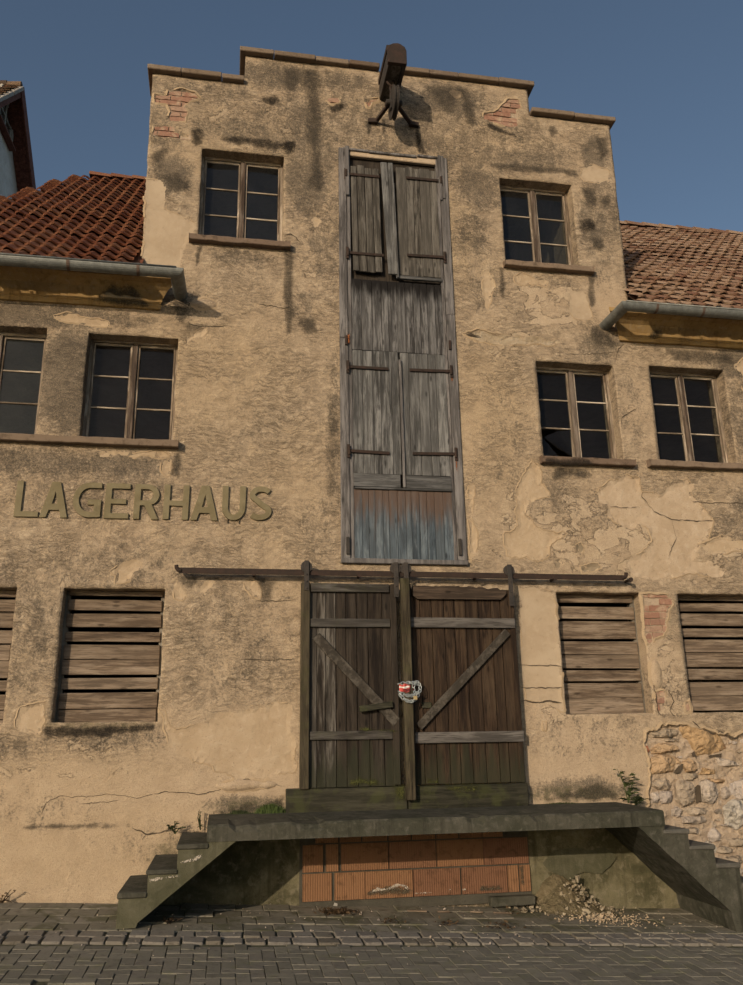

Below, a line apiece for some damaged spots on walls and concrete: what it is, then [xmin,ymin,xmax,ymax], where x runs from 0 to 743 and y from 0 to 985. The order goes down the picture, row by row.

flaking render [151,87,202,140]
leakage [286,70,320,157]
flaking render [482,97,523,127]
leakage [284,252,315,333]
flaking render [502,458,567,568]
spalling [575,542,602,574]
flaking render [594,473,743,646]
leakage [43,724,153,737]
crack [42,789,221,812]
leakage [557,784,617,801]
flaking render [643,688,743,876]